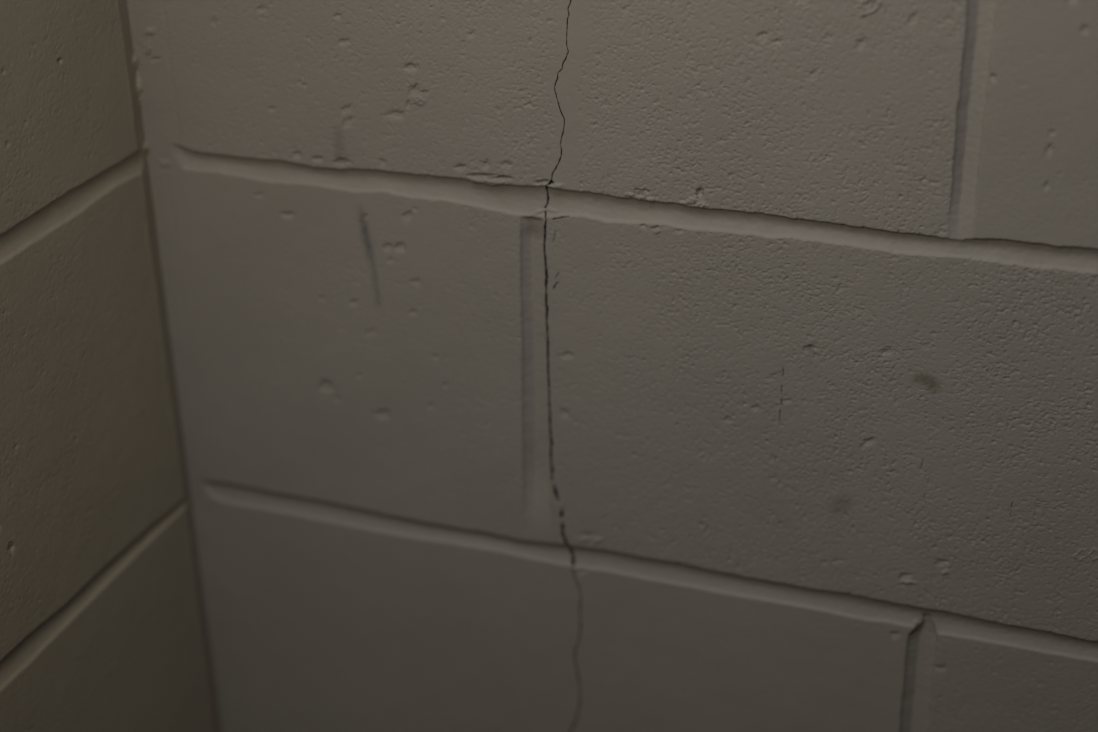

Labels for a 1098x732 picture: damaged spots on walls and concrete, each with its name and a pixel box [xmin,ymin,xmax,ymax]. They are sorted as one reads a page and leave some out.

crack [543,0,582,732]